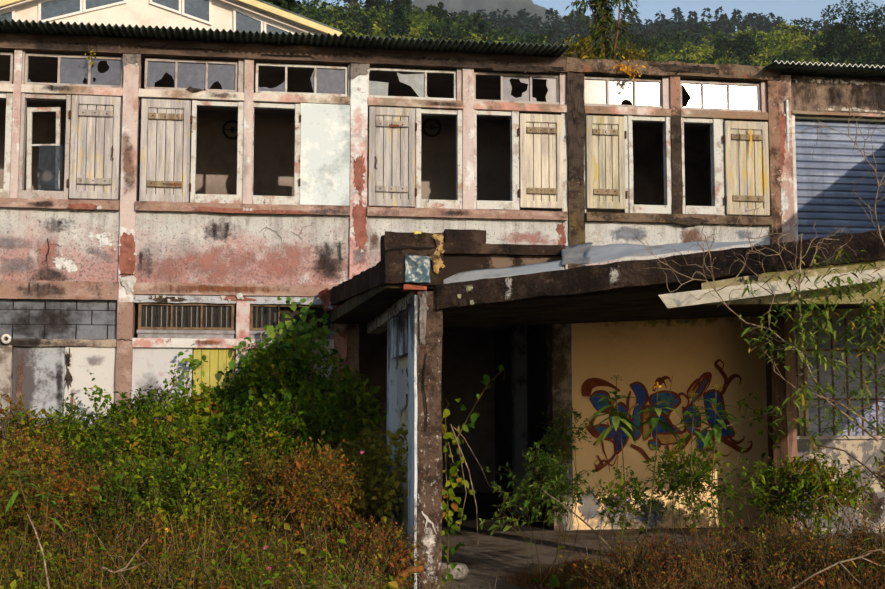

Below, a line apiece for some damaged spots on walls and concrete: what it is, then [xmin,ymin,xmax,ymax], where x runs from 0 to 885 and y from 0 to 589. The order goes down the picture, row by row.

damp [811,79,885,113]
peeling [352,153,368,252]
peeling [52,251,78,273]
peeling [88,231,137,295]
damp [138,223,343,282]
damp [354,234,378,262]